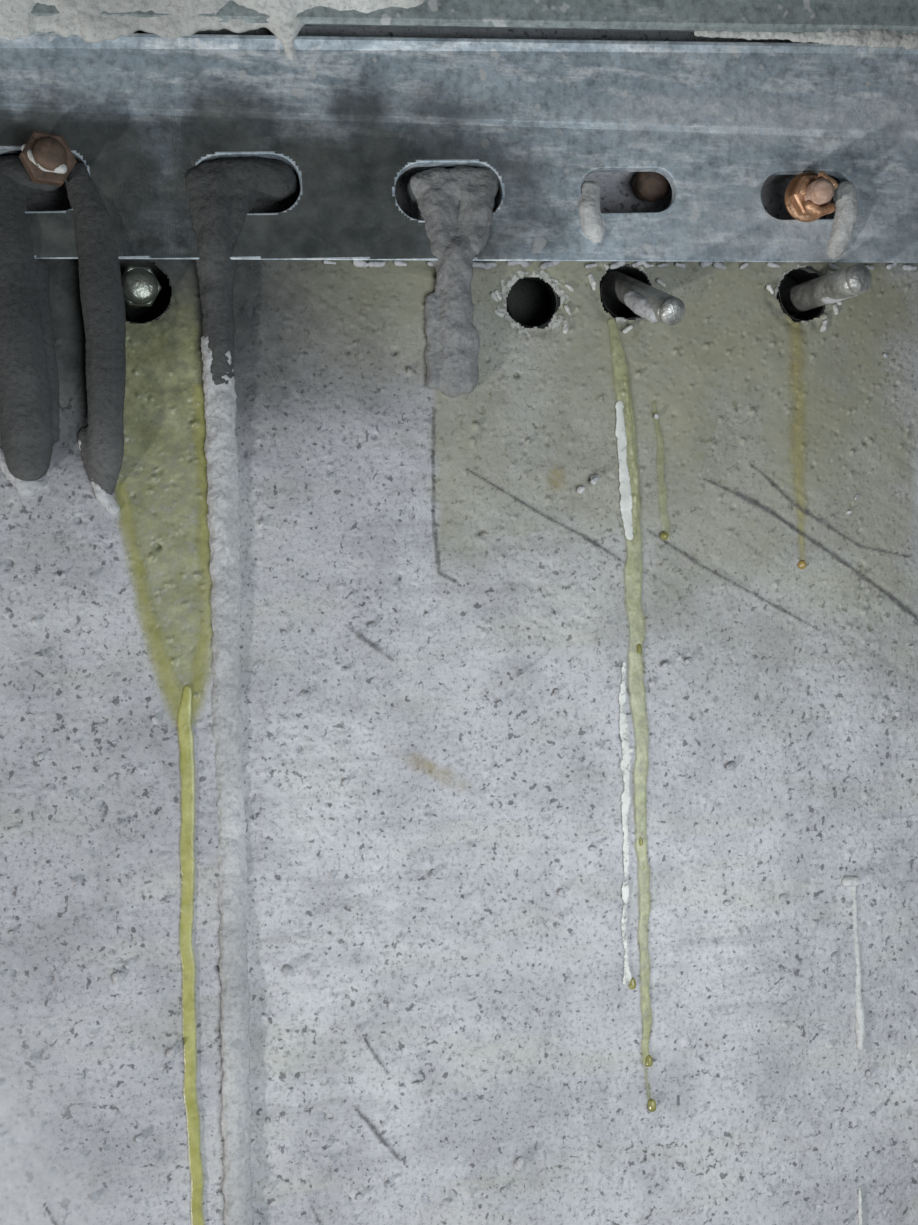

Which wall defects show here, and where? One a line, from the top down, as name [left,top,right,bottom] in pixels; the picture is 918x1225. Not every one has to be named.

corrosion [799,171,838,218]
water stain [43,259,88,406]
water stain [233,260,341,393]
water stain [371,260,437,319]
water stain [117,259,212,1225]
water stain [499,261,904,1112]